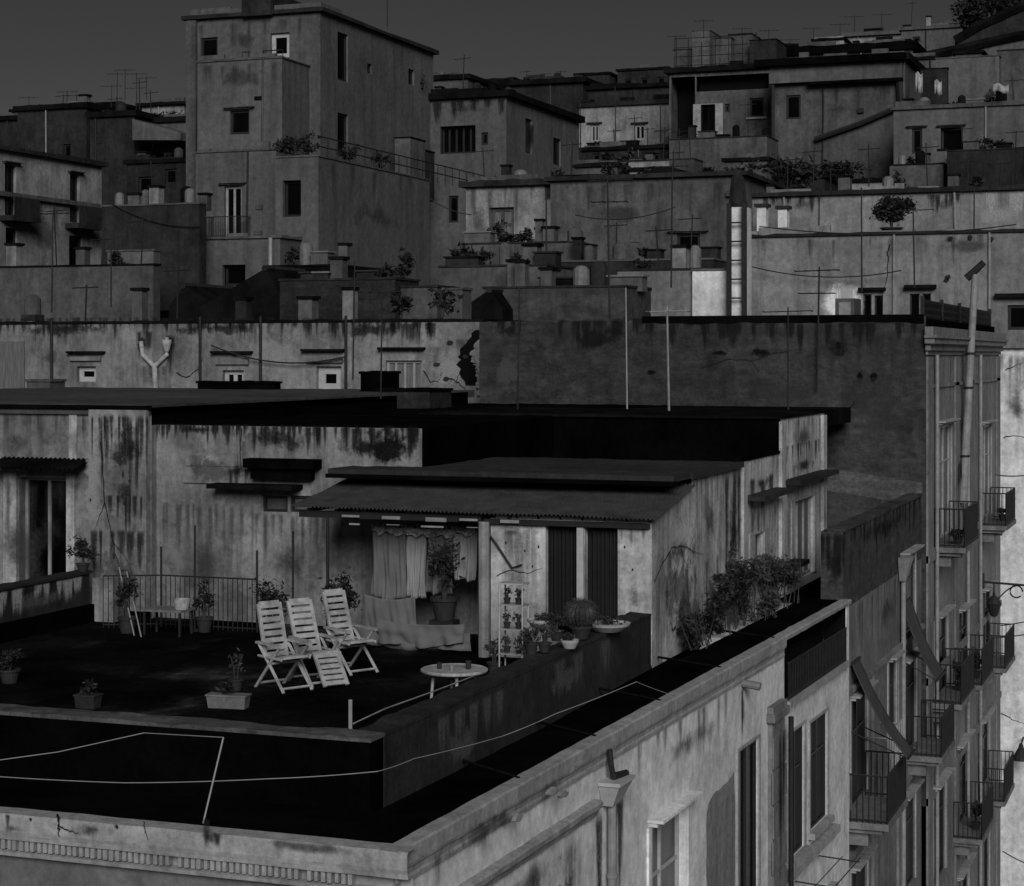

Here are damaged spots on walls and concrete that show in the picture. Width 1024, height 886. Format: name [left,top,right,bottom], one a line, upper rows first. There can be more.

leakage [576,319,653,347]
leakage [91,416,418,566]
leakage [725,475,773,560]
leakage [0,530,82,612]
crack [56,814,77,837]